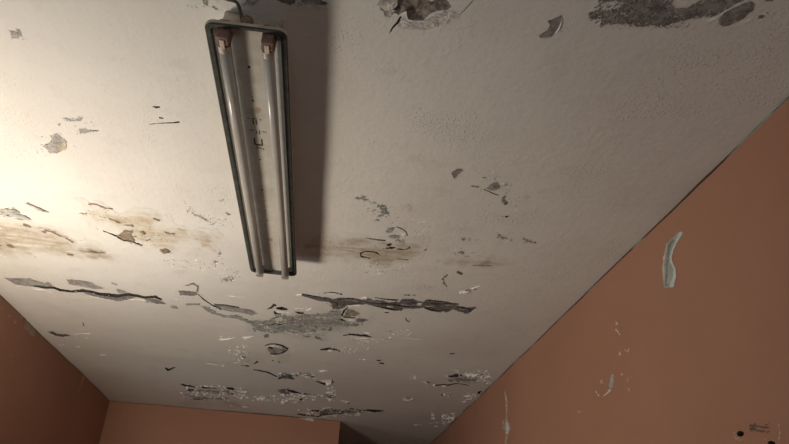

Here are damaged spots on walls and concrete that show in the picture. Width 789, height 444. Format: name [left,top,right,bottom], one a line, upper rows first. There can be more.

spalling [377,0,472,33]
peeling [538,15,577,39]
peeling [588,0,767,30]
peeling [37,116,98,156]
damp [0,208,119,265]
damp [74,197,223,256]
damp [296,231,430,276]
peeling [662,231,683,288]
peeling [171,283,375,347]
peeling [173,383,275,411]
peeling [445,370,493,402]